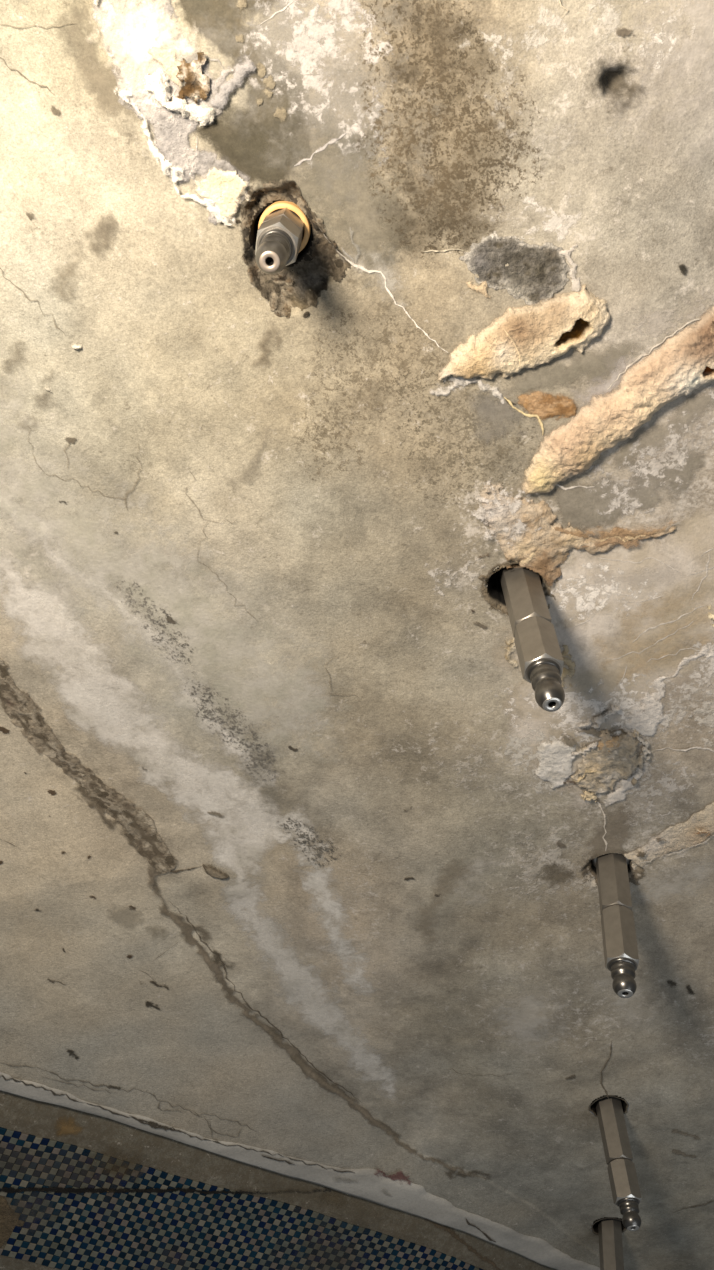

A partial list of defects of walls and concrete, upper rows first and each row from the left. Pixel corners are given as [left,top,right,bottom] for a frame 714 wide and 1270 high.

crack [0,57,53,94]
crack [0,22,73,30]
water stain [66,0,714,266]
crack [319,228,448,353]
water stain [430,283,714,442]
water stain [0,394,395,1098]
crack [0,658,489,1194]